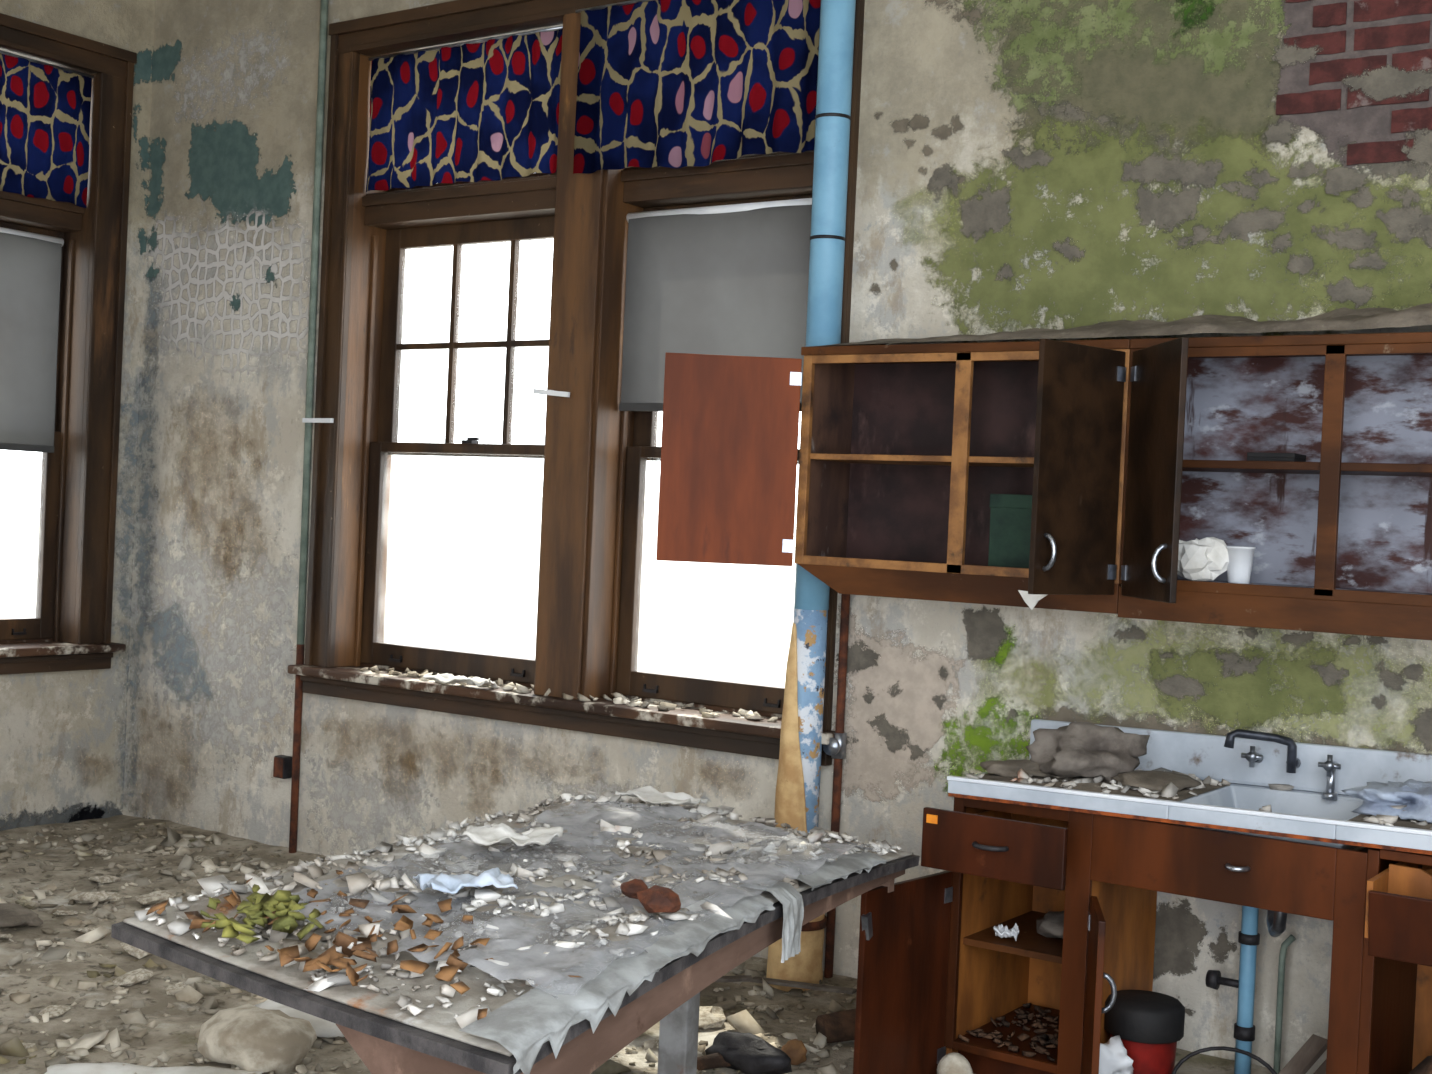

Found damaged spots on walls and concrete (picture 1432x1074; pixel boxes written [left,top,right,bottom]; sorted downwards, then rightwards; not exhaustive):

peeling [133,40,183,86]
peeling [132,103,167,282]
peeling [184,119,297,227]
flaking render [875,112,1011,241]
flaking render [990,0,1432,315]
peeling [230,293,241,311]
peeling [264,266,277,288]
flaking render [832,606,1008,802]